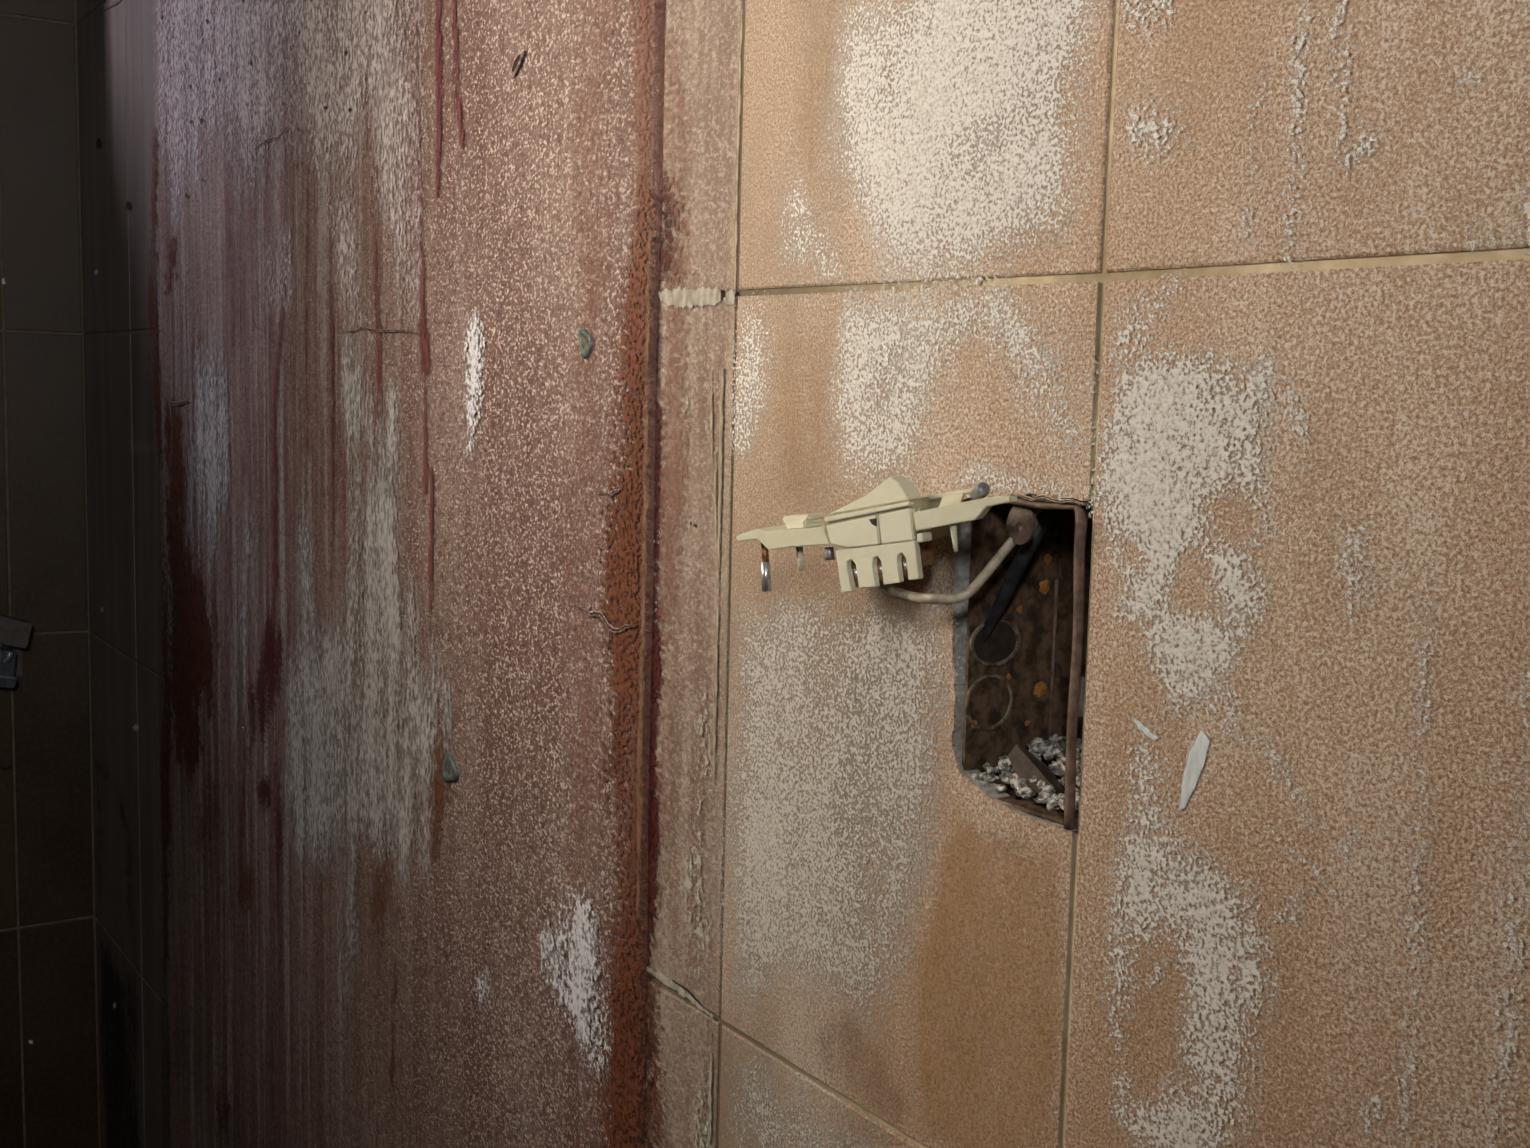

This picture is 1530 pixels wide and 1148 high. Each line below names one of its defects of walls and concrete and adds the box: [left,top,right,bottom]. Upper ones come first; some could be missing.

damp [1278,0,1380,266]
corrosion [148,130,218,1148]
corrosion [245,604,285,863]
damp [155,0,464,1001]
corrosion [427,723,449,861]
corrosion [586,0,691,1148]
damp [728,291,777,460]
damp [774,0,1318,1148]
damp [1329,515,1380,628]
damp [475,968,493,1010]
damp [537,881,614,1085]